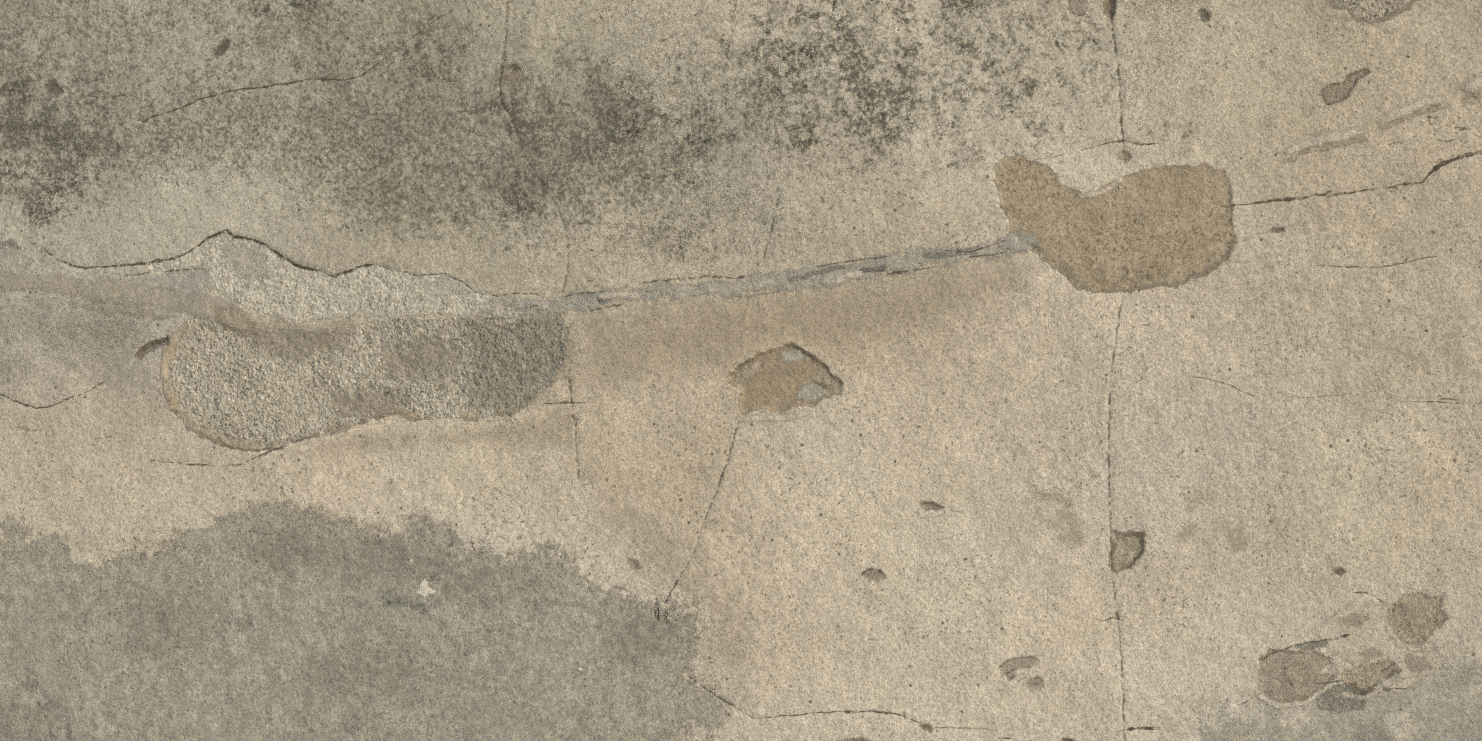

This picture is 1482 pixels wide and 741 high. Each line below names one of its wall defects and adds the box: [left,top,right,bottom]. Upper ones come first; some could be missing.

leakage [0,56,144,225]
leakage [472,76,554,152]
leakage [557,0,1049,170]
spalling [994,151,1237,293]
crack [1221,126,1482,207]
spalling [135,231,623,452]
spalling [728,343,843,422]
crack [665,423,739,603]
crack [1100,306,1155,738]
leakage [0,501,732,741]
crack [690,677,926,726]
peeling [1256,592,1450,713]